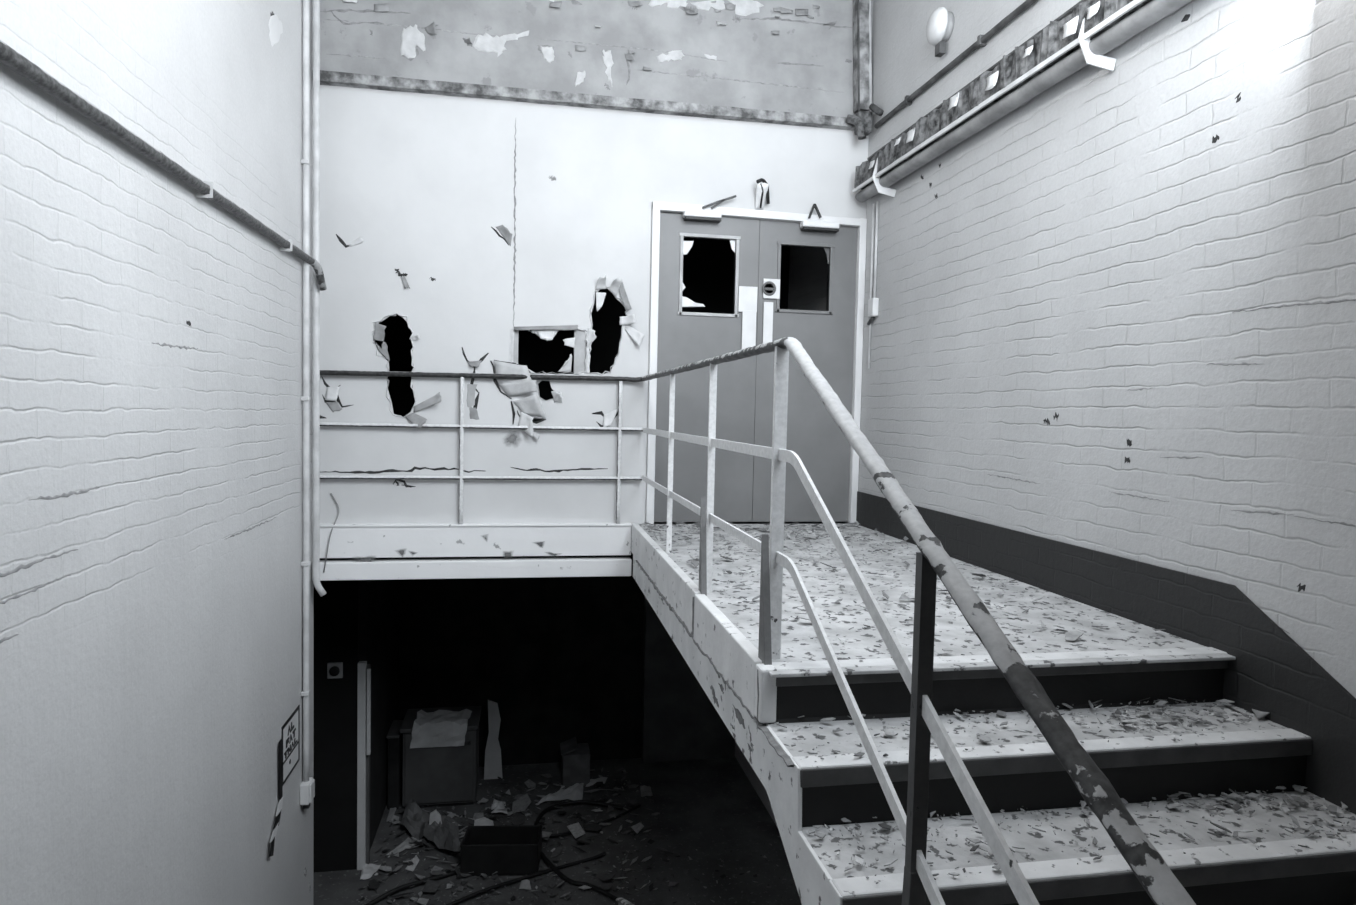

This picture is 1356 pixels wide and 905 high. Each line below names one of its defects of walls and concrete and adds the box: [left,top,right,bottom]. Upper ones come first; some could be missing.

peeling [628,0,837,34]
peeling [462,31,684,90]
crack [1232,299,1356,313]
crack [1207,360,1258,368]
crack [1160,453,1202,461]
crack [987,474,1040,484]
crack [1109,491,1169,502]
crack [1231,510,1356,527]